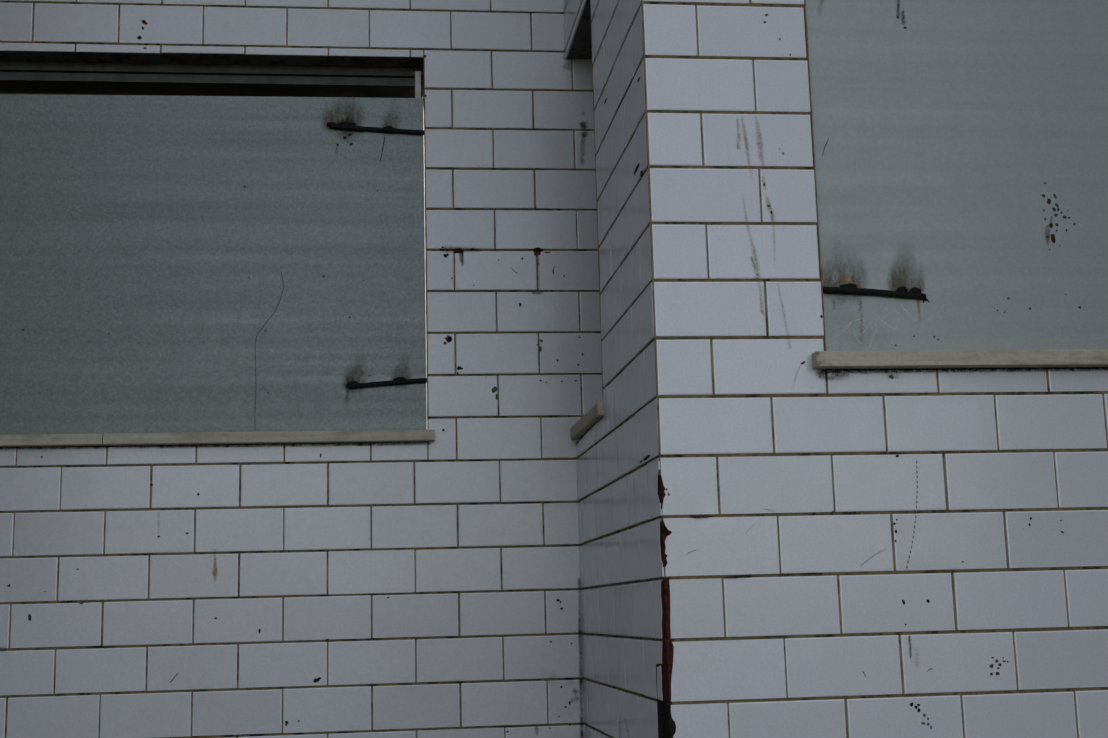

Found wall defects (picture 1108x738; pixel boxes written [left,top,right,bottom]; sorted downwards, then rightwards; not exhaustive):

rust [1042,182,1076,251]